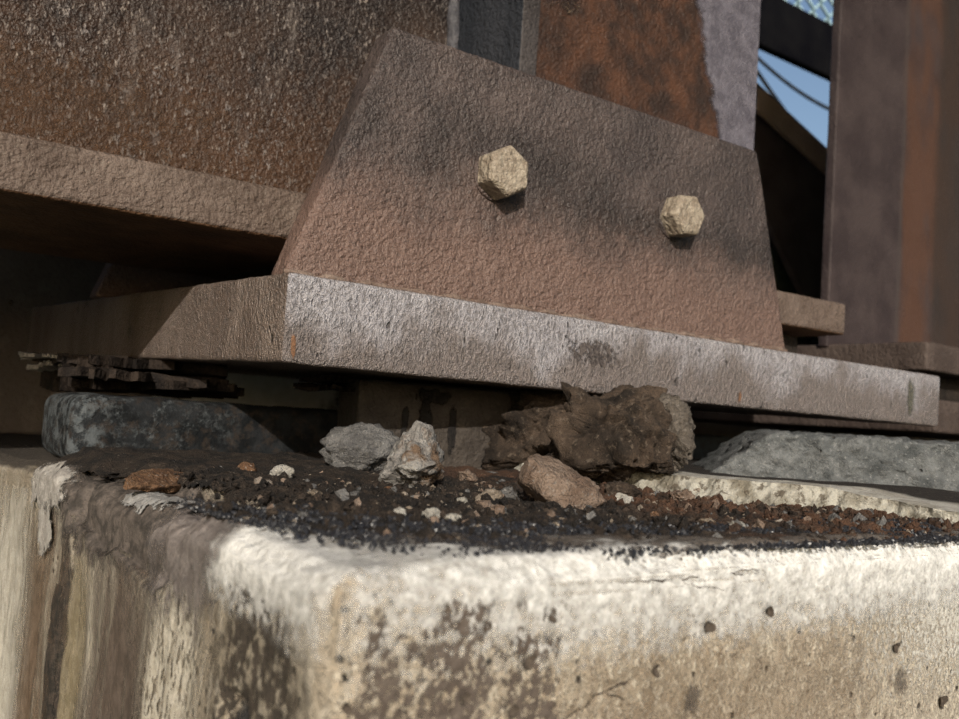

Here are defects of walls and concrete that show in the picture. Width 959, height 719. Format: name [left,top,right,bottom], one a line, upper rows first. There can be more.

damp [0,492,26,719]
damp [141,567,299,719]
crack [565,674,638,719]